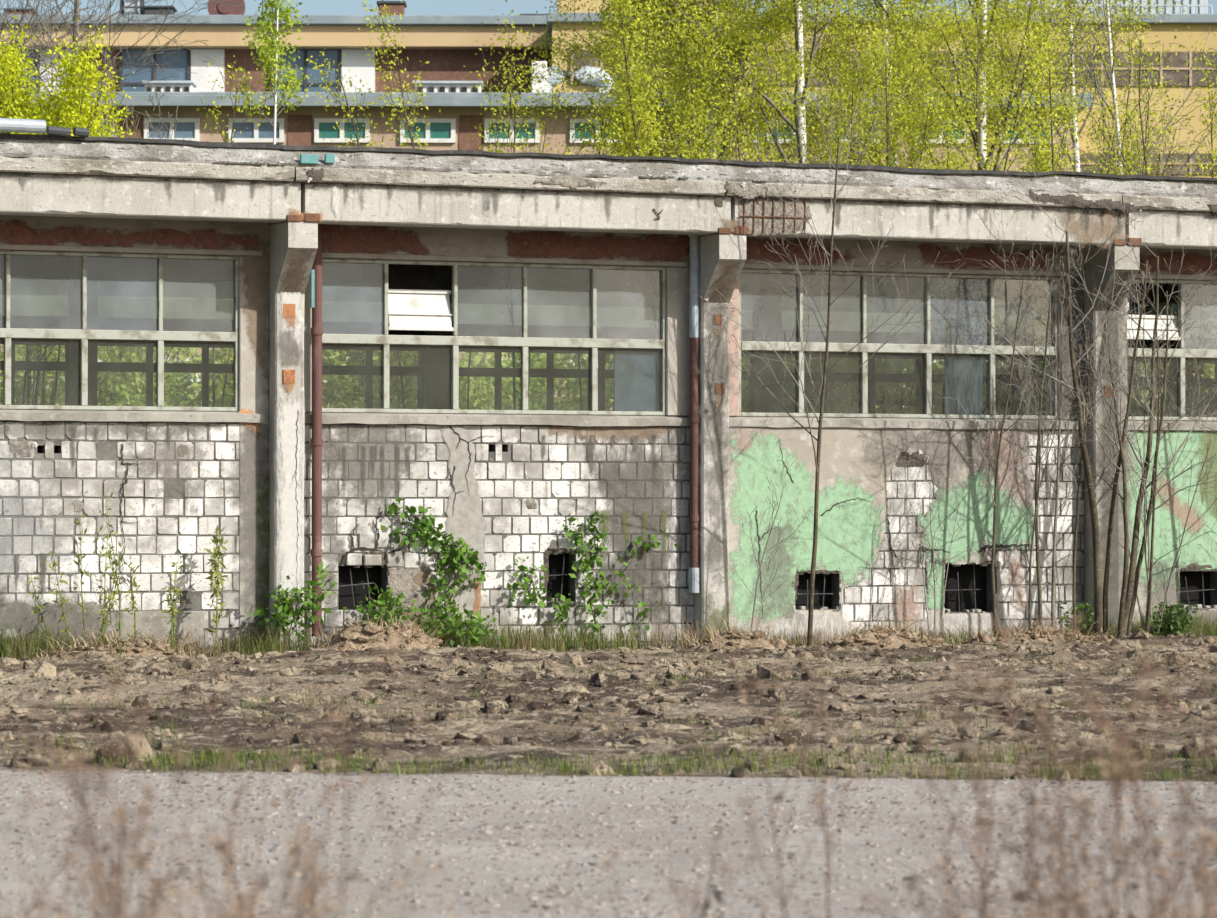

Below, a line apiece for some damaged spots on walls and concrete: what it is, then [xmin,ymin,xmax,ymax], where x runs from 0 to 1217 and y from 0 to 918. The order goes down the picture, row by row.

peeling [0,220,260,250]
peeling [322,224,430,255]
peeling [506,231,689,262]
spalling [714,179,855,265]
peeling [918,243,1057,270]
peeling [1137,251,1217,276]
crack [445,425,494,512]
peeling [728,427,1035,630]